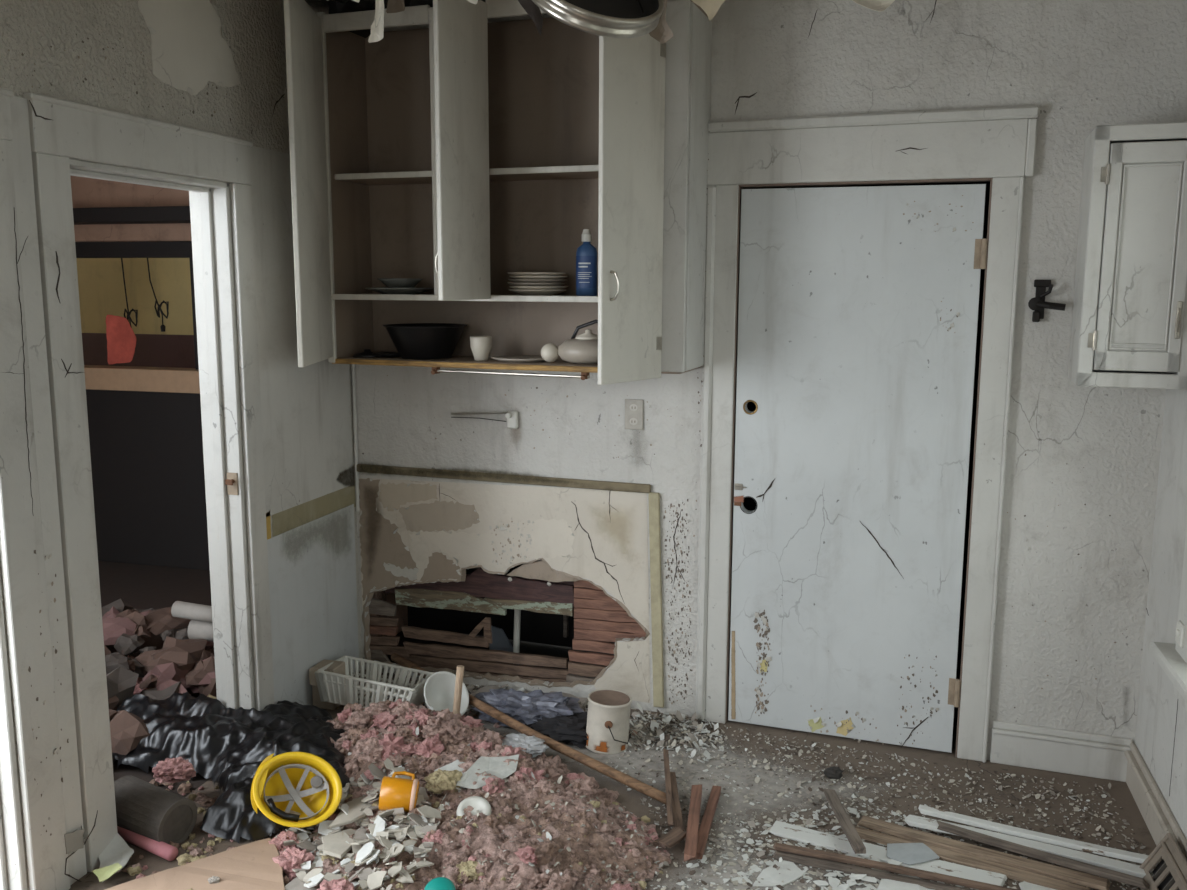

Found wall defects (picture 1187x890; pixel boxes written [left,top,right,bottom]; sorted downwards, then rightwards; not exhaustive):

peeling [137,0,240,119]
peeling [368,0,405,43]
peeling [518,0,543,35]
peeling [691,0,725,21]
flaking render [353,478,650,703]
crack [571,491,625,604]
peeling [663,499,697,704]
crack [861,523,904,579]